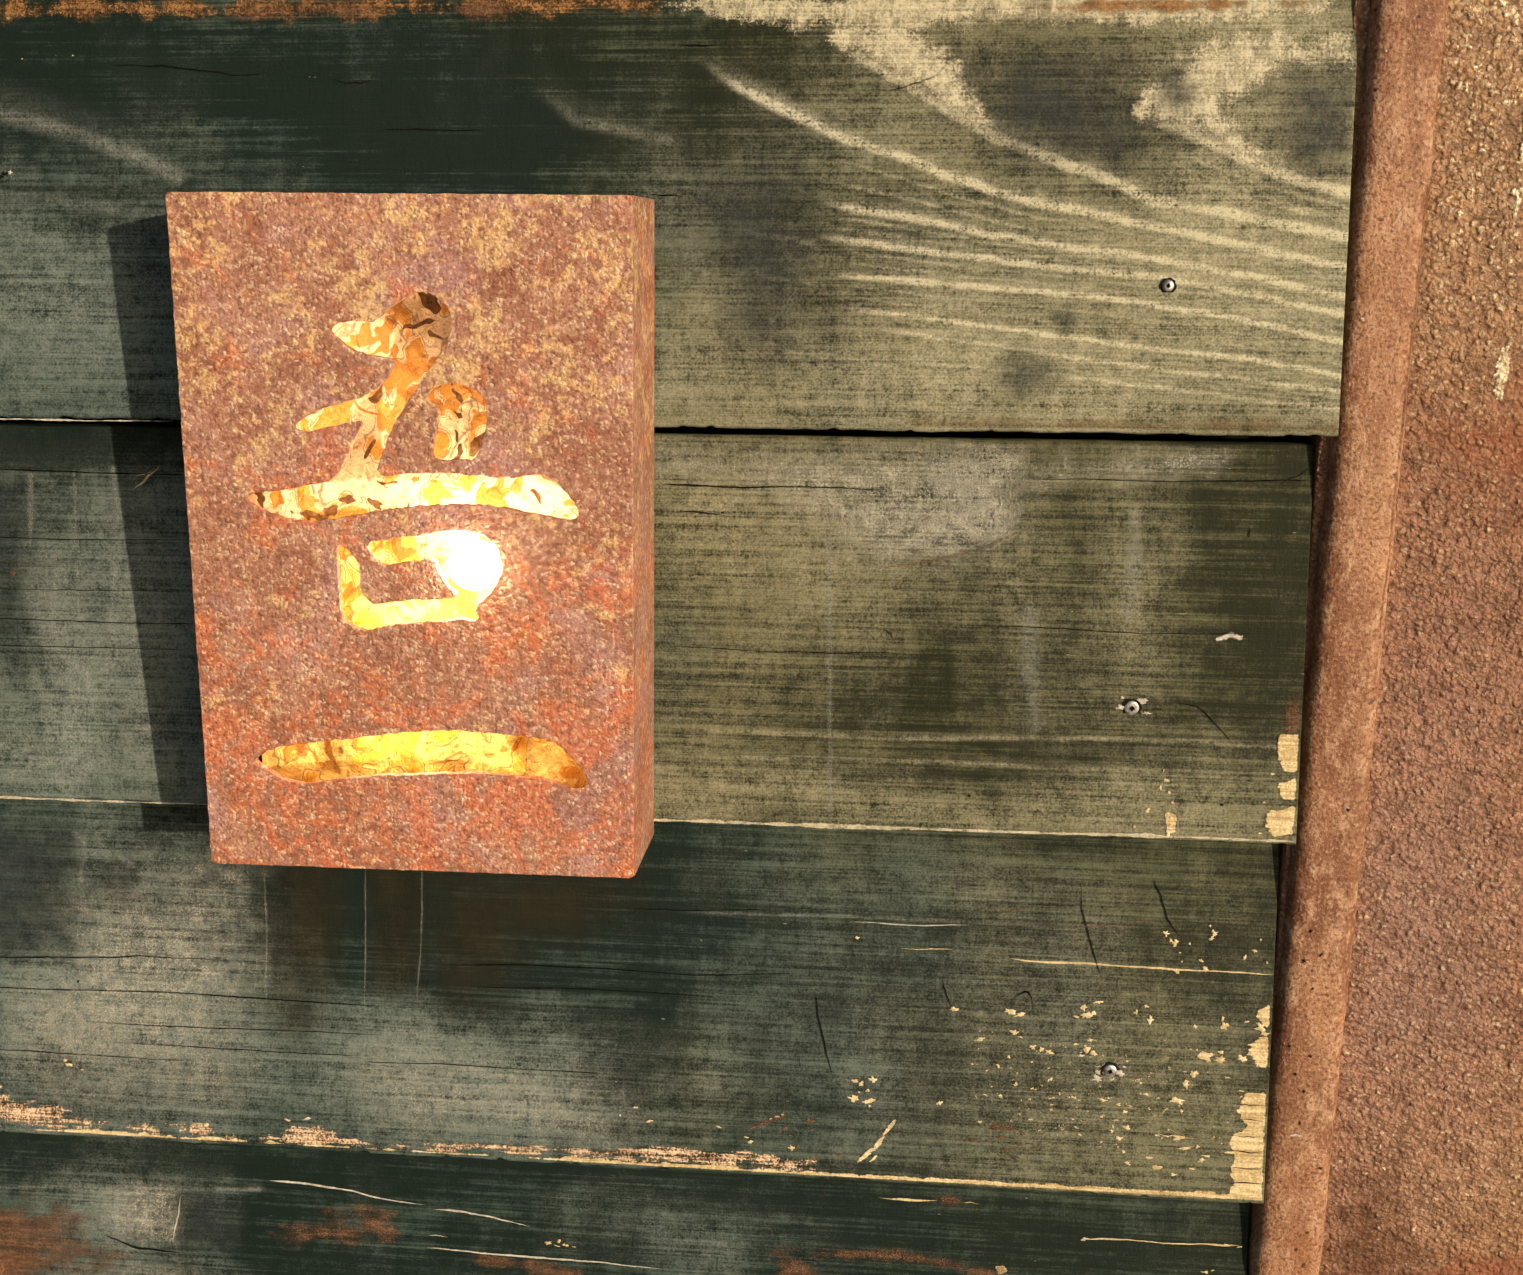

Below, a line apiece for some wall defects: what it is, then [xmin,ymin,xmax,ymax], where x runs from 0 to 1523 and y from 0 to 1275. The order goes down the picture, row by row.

corrosion [1,0,656,22]
peeling [1258,698,1299,837]
peeling [1163,931,1208,974]
peeling [0,1001,1270,1204]